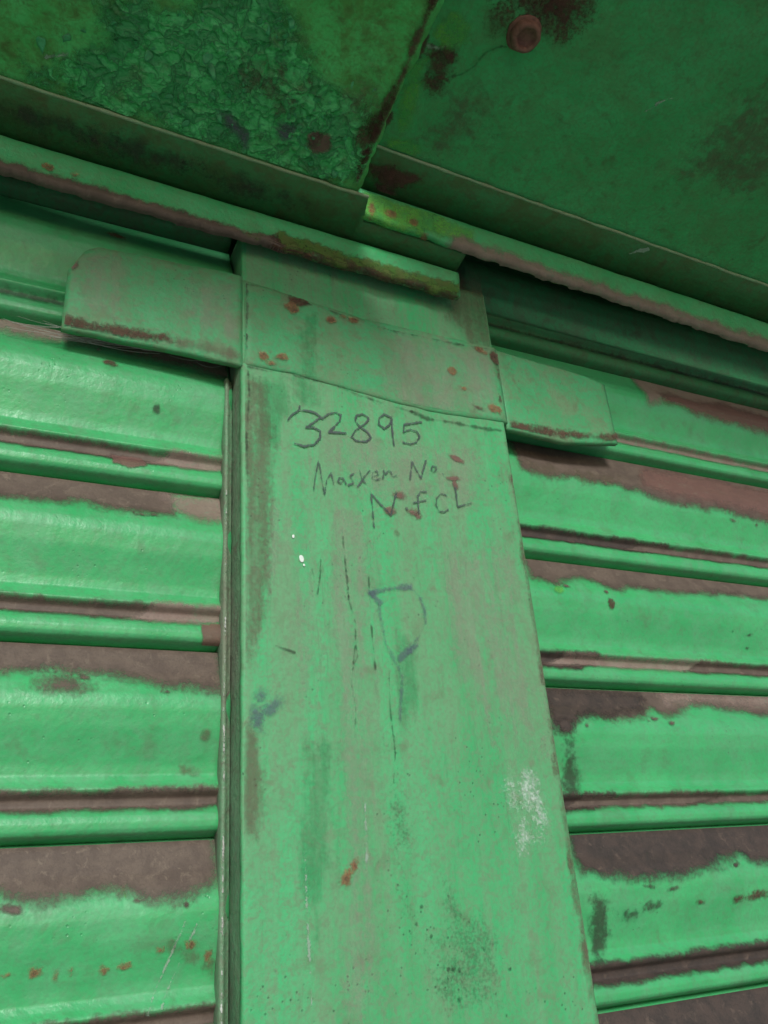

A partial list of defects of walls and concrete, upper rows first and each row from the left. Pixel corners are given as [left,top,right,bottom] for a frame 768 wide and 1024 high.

rust [356,0,457,196]
rust [0,159,457,300]
rust [64,315,170,341]
rust [284,297,308,312]
rust [511,422,617,440]
peeling [0,471,227,524]
peeling [509,441,768,526]
peeling [0,592,228,695]
peeling [546,688,768,734]
peeling [0,837,225,914]
rust [342,862,357,884]
peeling [569,825,768,890]